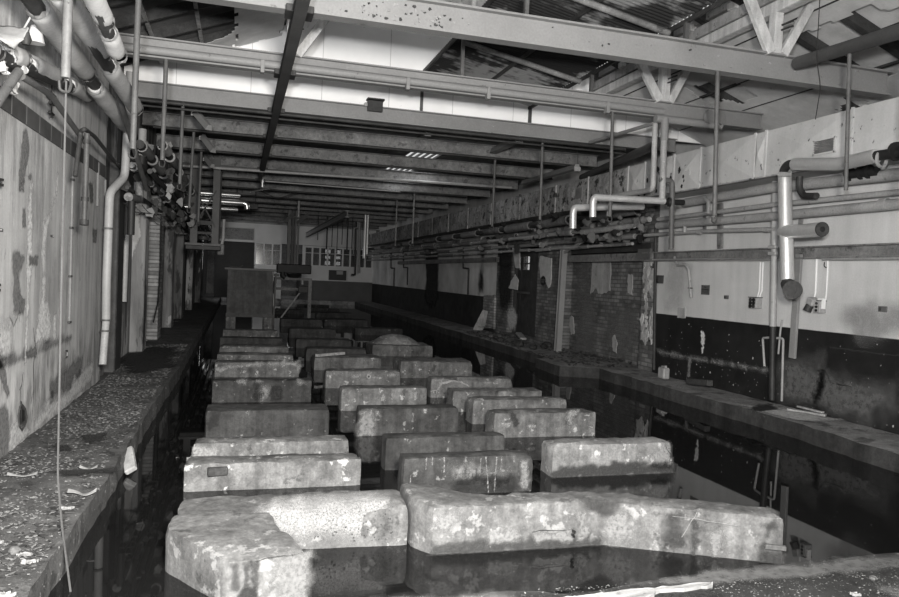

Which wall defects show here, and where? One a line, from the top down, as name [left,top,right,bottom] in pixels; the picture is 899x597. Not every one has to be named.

water stain [0,173,93,459]
peeling [639,262,654,345]
water stain [49,467,117,475]
water stain [81,433,106,443]